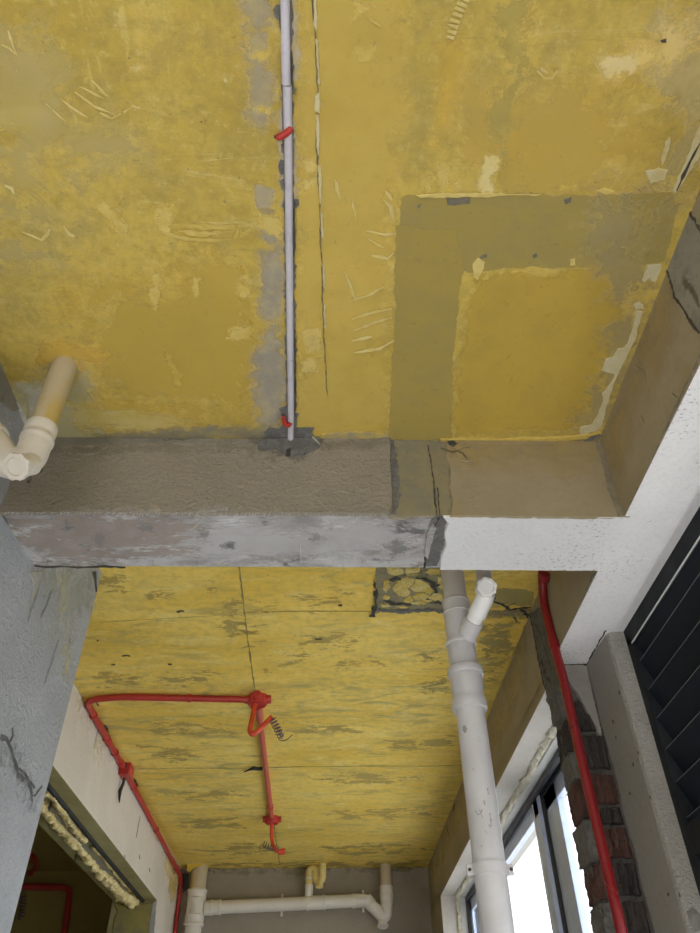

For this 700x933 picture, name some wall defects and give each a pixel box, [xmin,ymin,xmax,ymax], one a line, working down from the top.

peeling [645,137,671,183]
peeling [672,125,700,193]
peeling [580,302,644,442]
flaking render [369,440,451,617]
damp [217,600,266,648]
damp [264,632,385,673]
damp [289,722,361,734]
damp [383,735,455,751]
crack [0,728,52,812]
damp [314,773,417,785]
damp [198,789,466,881]